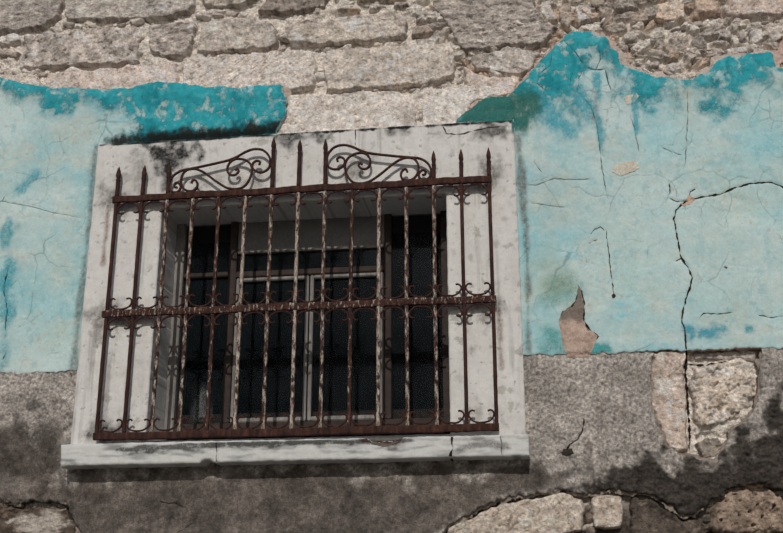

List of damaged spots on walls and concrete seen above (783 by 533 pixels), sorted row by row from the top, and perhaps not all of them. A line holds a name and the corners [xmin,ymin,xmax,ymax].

damp [0,78,323,190]
crack [529,40,611,207]
damp [425,31,783,249]
crack [664,93,688,162]
crack [590,226,614,293]
spalling [559,285,599,358]
crack [669,182,783,452]